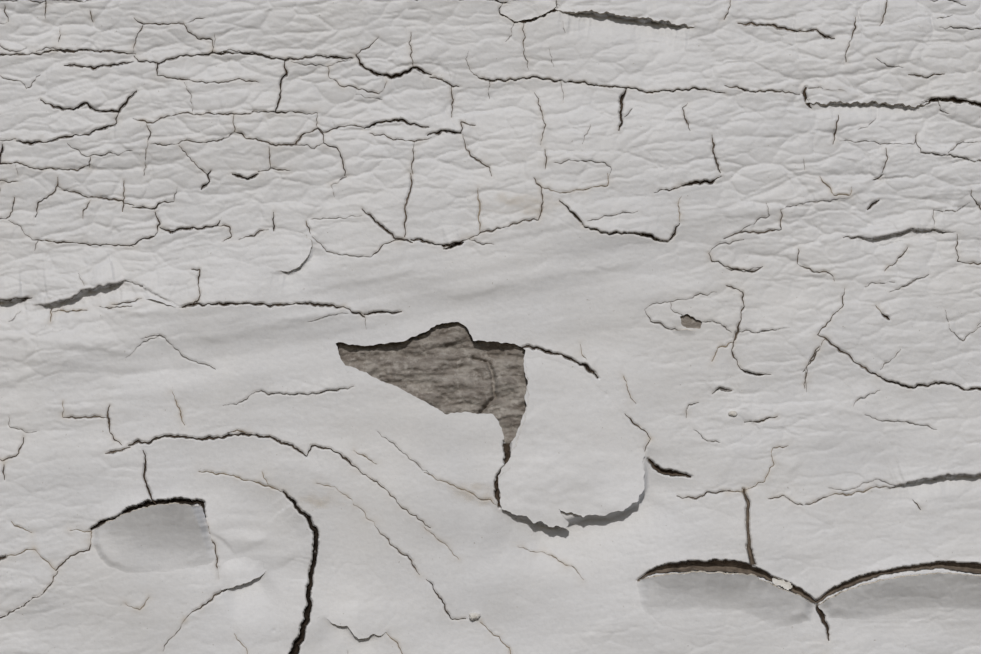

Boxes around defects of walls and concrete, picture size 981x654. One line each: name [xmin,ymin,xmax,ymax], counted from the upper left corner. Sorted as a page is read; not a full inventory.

crack [0,0,856,257]
crack [876,58,981,113]
crack [9,269,402,326]
crack [0,392,458,654]
crack [223,386,353,406]
crack [318,483,511,654]
crack [377,431,510,507]
peeling [336,322,645,528]
crack [522,345,599,378]
crack [624,378,981,641]
crack [645,115,981,442]